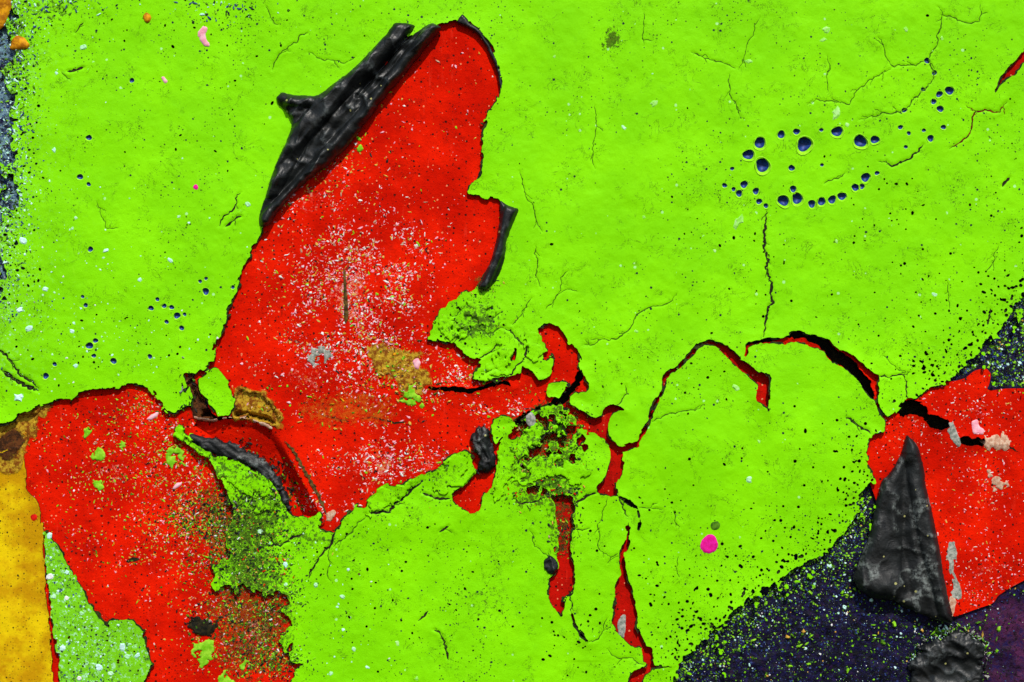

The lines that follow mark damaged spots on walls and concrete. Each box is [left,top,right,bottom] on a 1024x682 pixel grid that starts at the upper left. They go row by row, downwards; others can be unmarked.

crack [949,52,1024,149]
peeling [20,14,610,682]
crack [514,211,985,682]
peeling [853,369,1024,682]